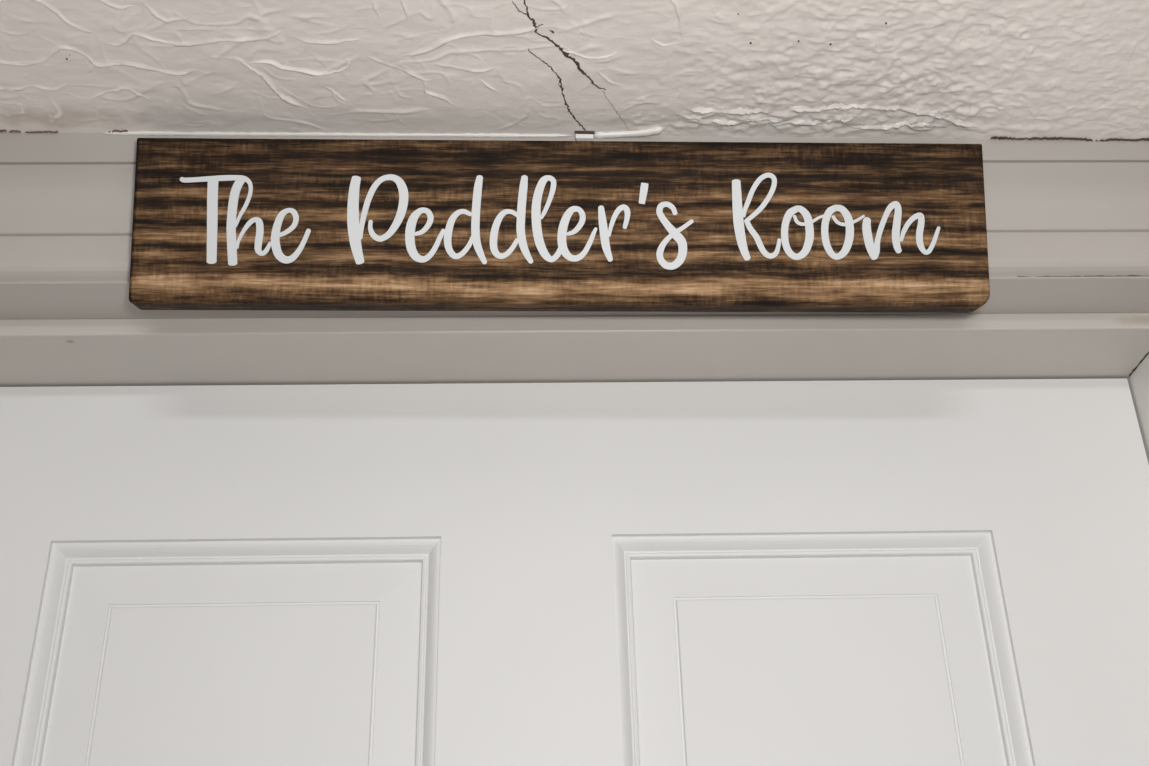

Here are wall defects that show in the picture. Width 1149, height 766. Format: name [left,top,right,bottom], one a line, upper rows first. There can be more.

crack [512,0,628,131]